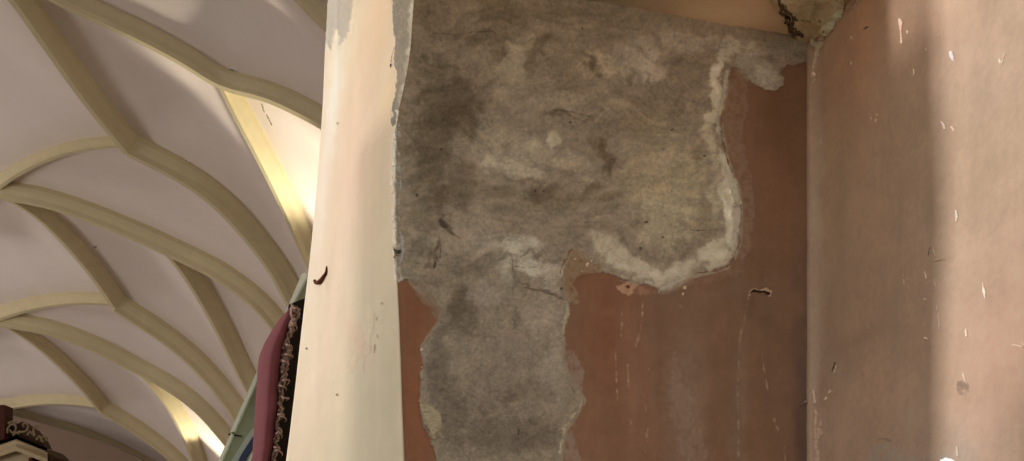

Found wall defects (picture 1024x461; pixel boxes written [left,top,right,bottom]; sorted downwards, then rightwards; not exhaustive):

peeling [325,0,359,52]
flaking render [389,0,859,461]